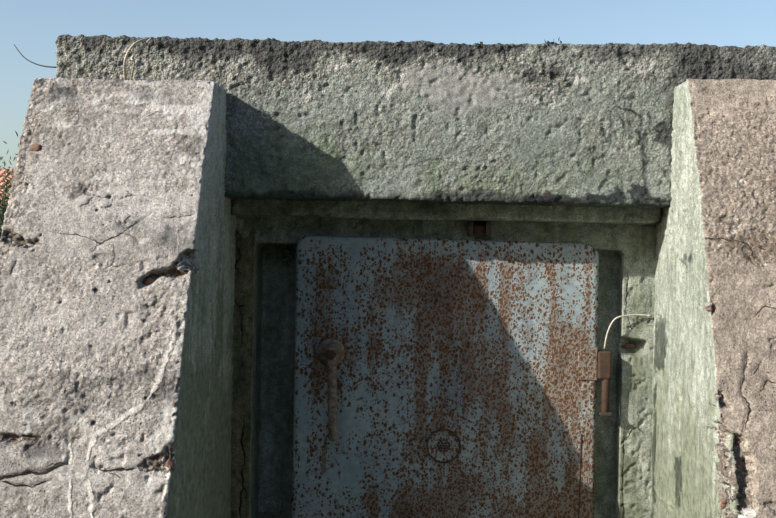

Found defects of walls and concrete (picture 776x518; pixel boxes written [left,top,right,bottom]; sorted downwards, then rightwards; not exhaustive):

damp [524,106,672,206]
spalling [1,230,40,248]
crack [59,213,194,267]
spalling [142,249,201,285]
crack [705,237,767,265]
damp [86,320,177,461]
crack [740,355,776,431]
crack [0,440,62,488]
damp [161,434,176,501]
spalling [713,421,754,518]
damp [86,480,94,518]
damp [738,508,756,518]